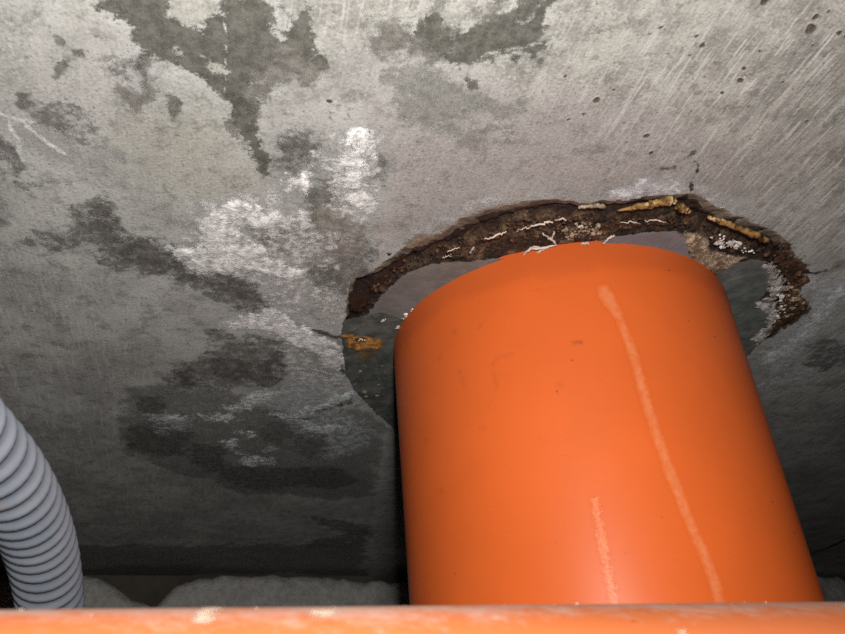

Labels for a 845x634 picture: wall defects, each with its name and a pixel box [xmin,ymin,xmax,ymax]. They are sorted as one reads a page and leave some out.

water stain [584,173,763,218]
water stain [20,121,503,501]
corrosion [340,334,384,362]
corrosion [762,240,812,339]